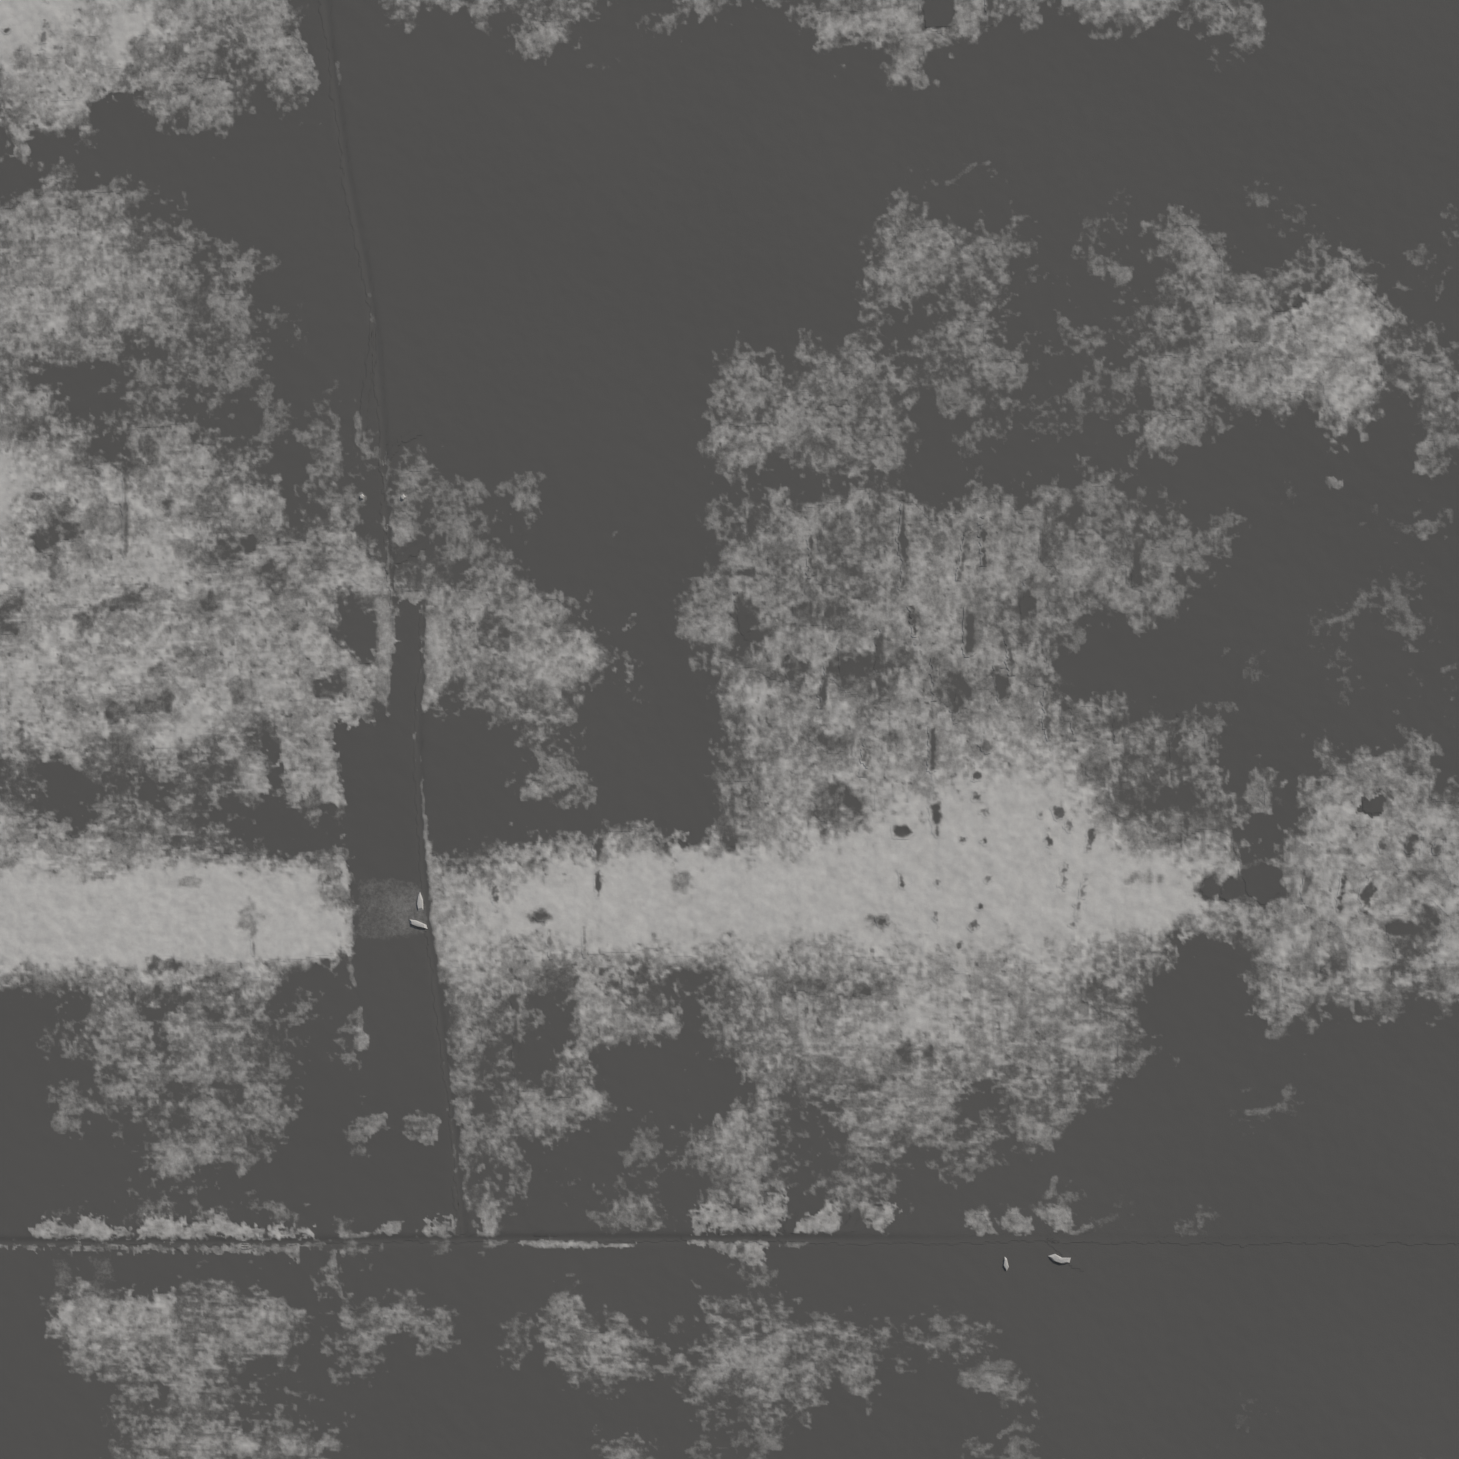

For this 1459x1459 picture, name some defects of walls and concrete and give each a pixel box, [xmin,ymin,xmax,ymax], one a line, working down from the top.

damp [0,0,1459,908]
crack [0,524,1459,1319]
damp [0,931,1459,1459]
damp [1386,909,1440,975]